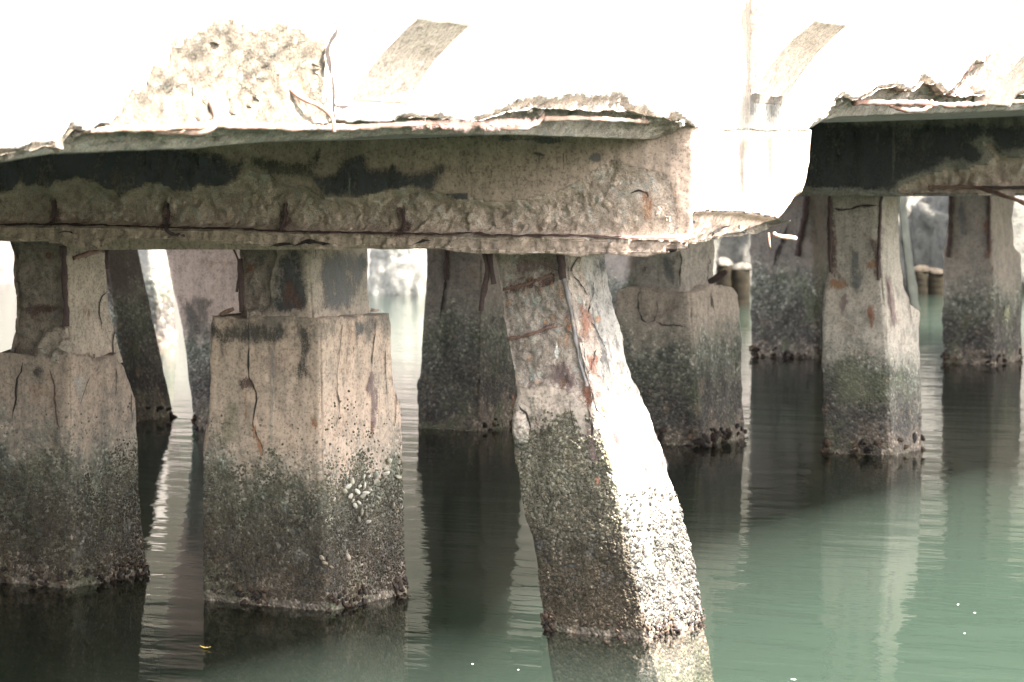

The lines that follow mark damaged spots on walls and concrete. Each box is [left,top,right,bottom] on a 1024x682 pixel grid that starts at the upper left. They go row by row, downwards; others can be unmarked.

spalling [0,18,696,162]
spalling [815,59,991,122]
water stain [0,149,444,198]
water stain [804,122,1024,193]
crack [0,223,684,372]
spalling [0,159,810,424]
corrosion [506,258,564,301]
corrosion [509,305,600,344]
crack [12,362,23,418]
crack [49,369,60,429]
crack [240,324,263,449]
corrosion [551,356,609,414]